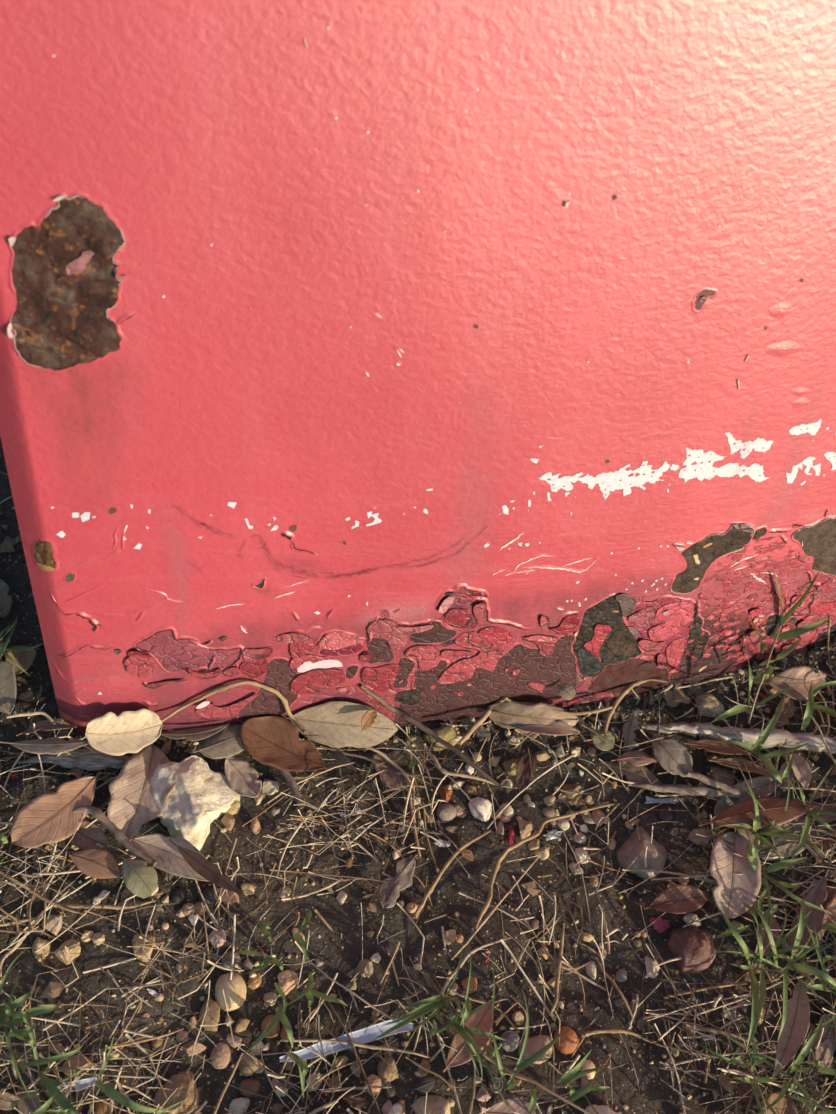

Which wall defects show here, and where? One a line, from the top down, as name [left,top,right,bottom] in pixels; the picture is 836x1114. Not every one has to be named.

rust [7,190,129,375]
spalling [690,287,719,314]
peeling [502,432,773,515]
peeling [789,419,829,441]
peeling [786,451,836,485]
peeling [115,537,836,727]